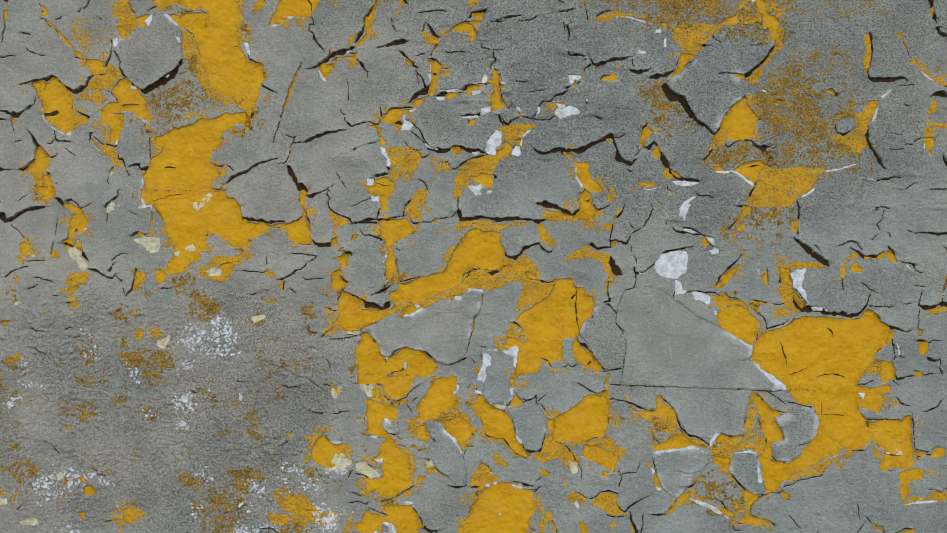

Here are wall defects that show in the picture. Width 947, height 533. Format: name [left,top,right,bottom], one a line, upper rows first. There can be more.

peeling [19,71,86,137]
peeling [16,135,96,271]
crack [0,0,214,303]
peeling [40,0,323,284]
peeling [269,0,339,30]
peeling [318,0,392,83]
peeling [450,127,531,196]
peeling [555,99,588,119]
peeling [542,142,607,233]
crack [216,0,947,533]
peeling [654,0,786,146]
peeling [304,170,947,533]